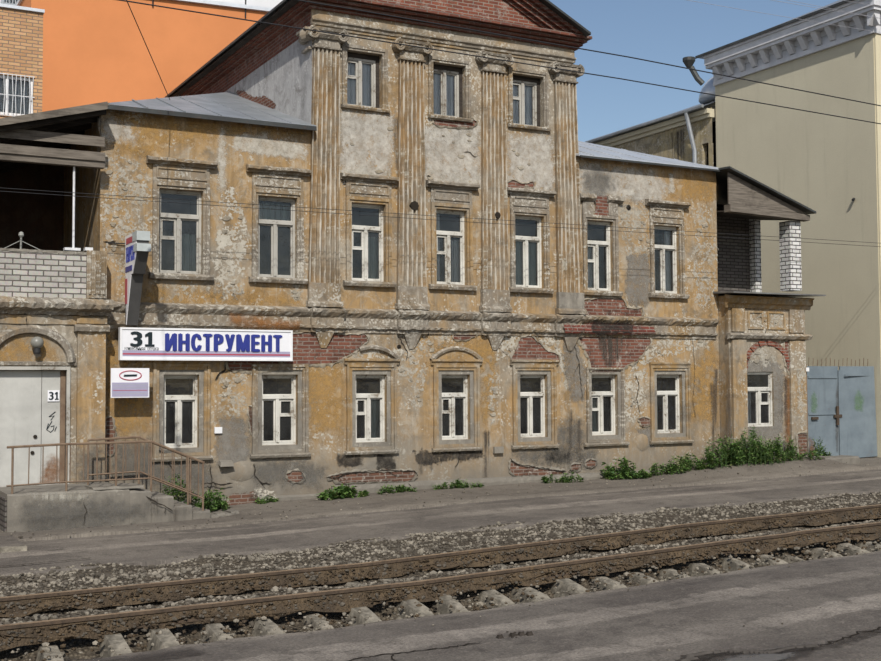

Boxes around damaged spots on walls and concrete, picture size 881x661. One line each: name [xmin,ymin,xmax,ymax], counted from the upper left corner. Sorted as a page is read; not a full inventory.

flaking render [507,133,555,190]
flaking render [219,332,478,435]
flaking render [496,296,712,428]
spalling [750,340,809,456]
spalling [326,468,418,485]
spalling [508,458,598,477]